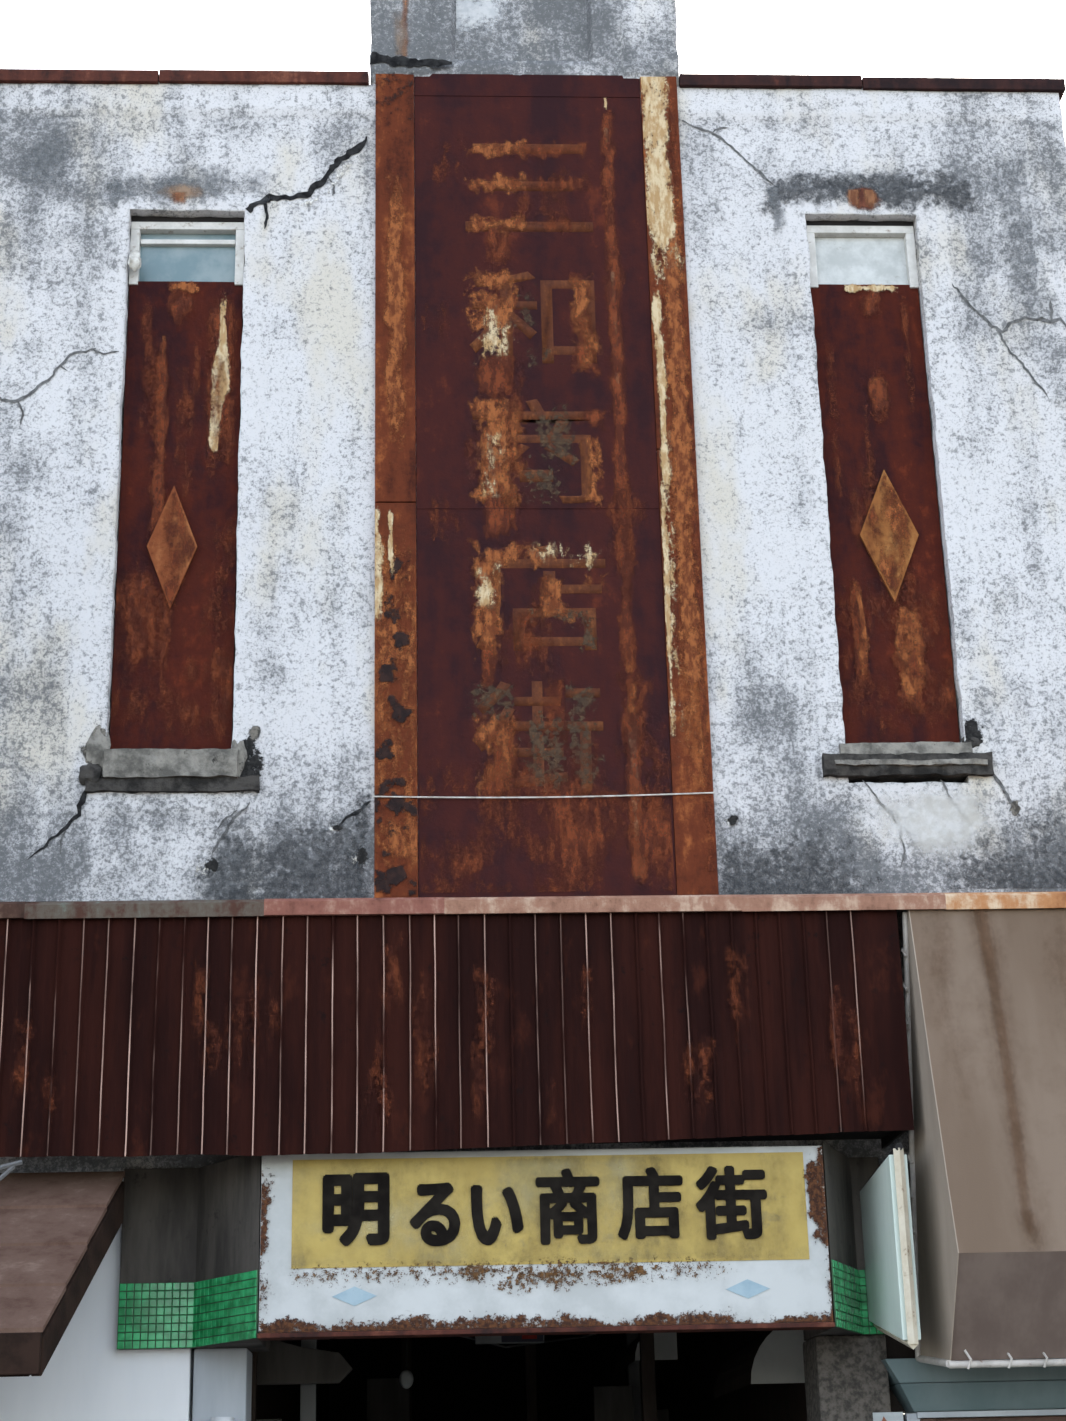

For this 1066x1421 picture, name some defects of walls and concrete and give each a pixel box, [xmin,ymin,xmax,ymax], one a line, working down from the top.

crack [245,136,367,229]
crack [0,348,118,425]
corrosion [168,281,199,324]
corrosion [844,284,898,315]
crack [952,284,1066,399]
corrosion [112,300,237,732]
corrosion [842,378,956,713]
crack [28,790,87,859]